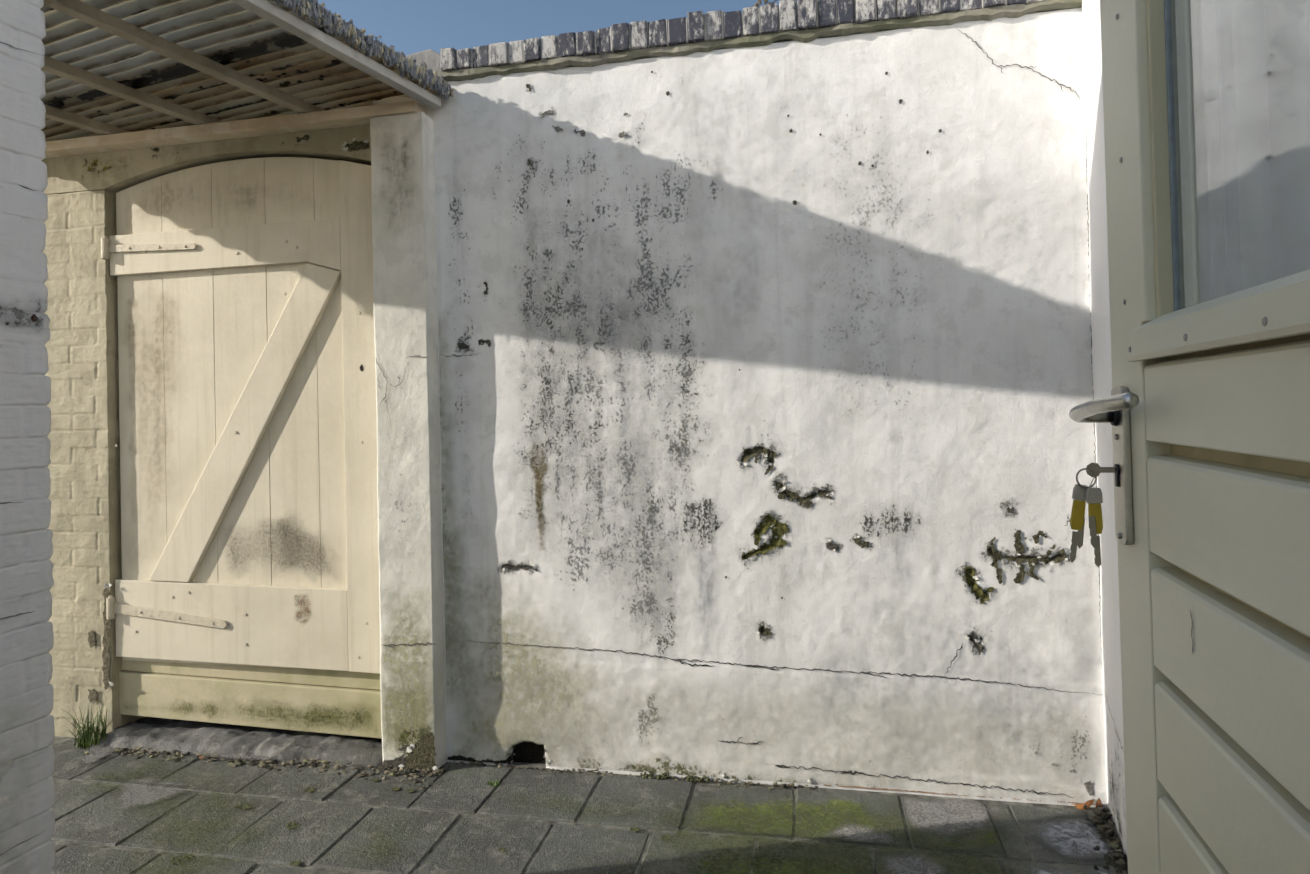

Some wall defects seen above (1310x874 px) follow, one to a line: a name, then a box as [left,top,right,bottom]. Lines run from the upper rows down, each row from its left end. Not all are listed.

crack [957,29,1097,488]
crack [376,353,478,425]
damp [499,152,722,657]
damp [859,504,920,536]
crack [384,534,1124,752]
crack [396,726,424,764]
spalling [382,732,551,770]
crack [718,737,1072,798]